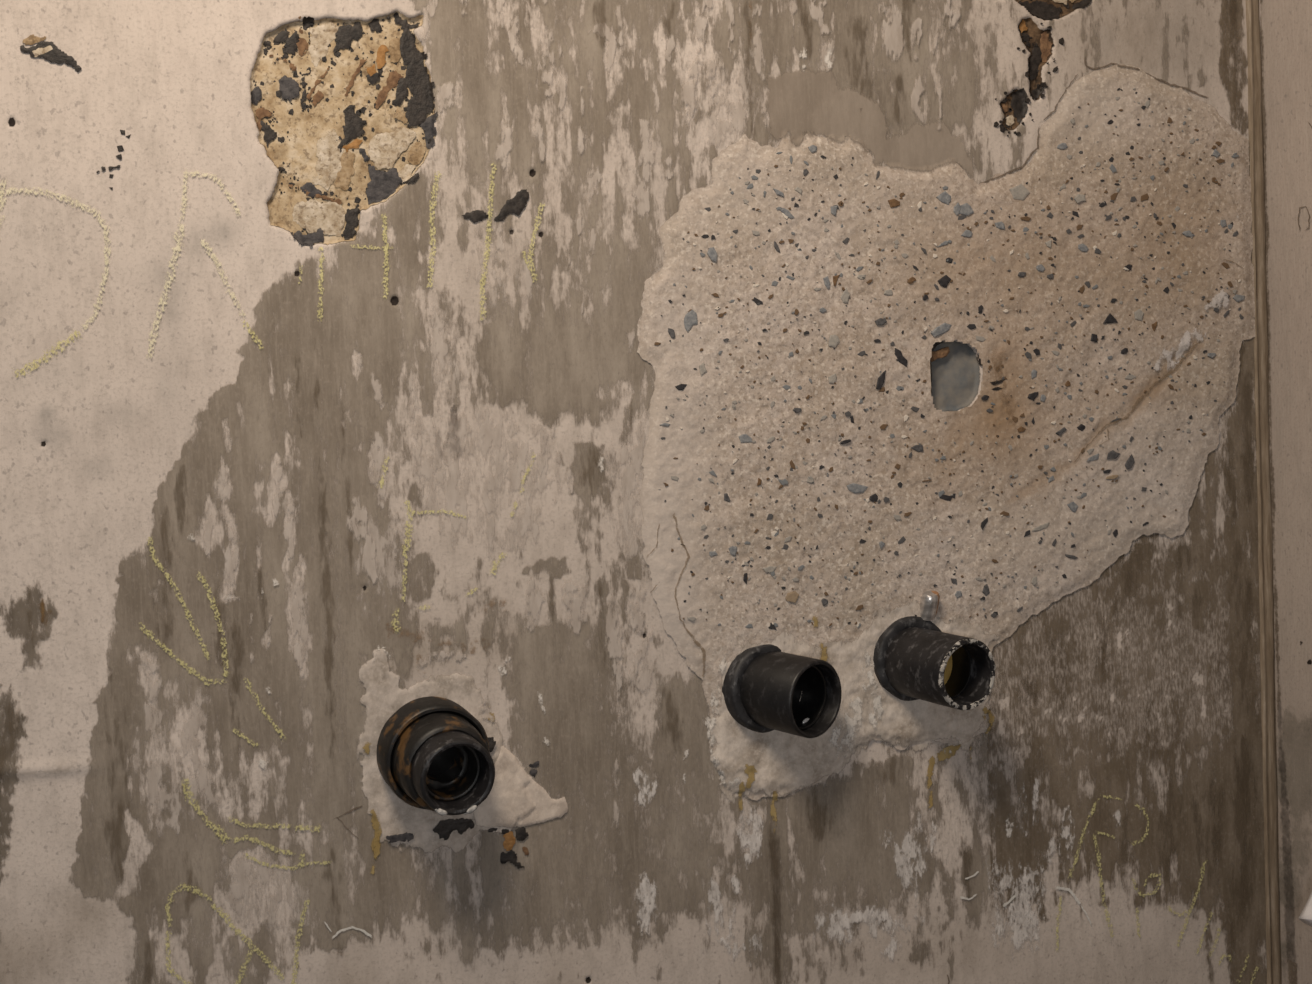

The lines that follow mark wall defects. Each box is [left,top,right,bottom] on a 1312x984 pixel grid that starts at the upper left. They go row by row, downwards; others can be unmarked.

spalling [20,34,82,72]
spalling [250,11,438,246]
leakage [412,0,989,556]
spalling [637,0,1255,754]
crack [1075,343,1197,462]
leakage [0,584,58,667]
leakage [70,171,1267,984]
crack [651,515,706,676]
leakage [0,685,26,882]